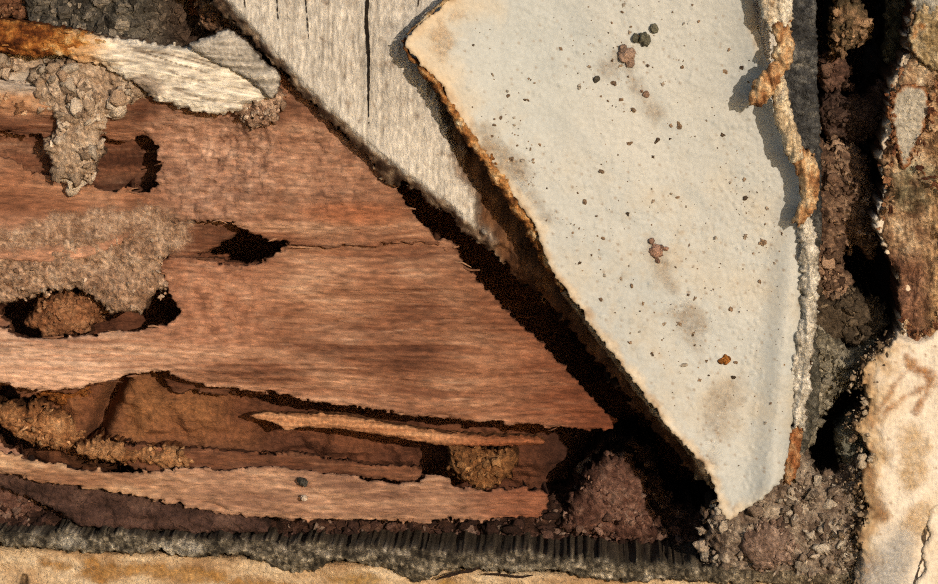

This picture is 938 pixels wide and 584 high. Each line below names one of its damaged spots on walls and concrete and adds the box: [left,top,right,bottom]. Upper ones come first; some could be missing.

peeling [189,28,281,99]
crack [363,0,371,123]
flaking render [874,0,938,341]
peeling [401,0,821,521]
peeling [914,505,938,584]